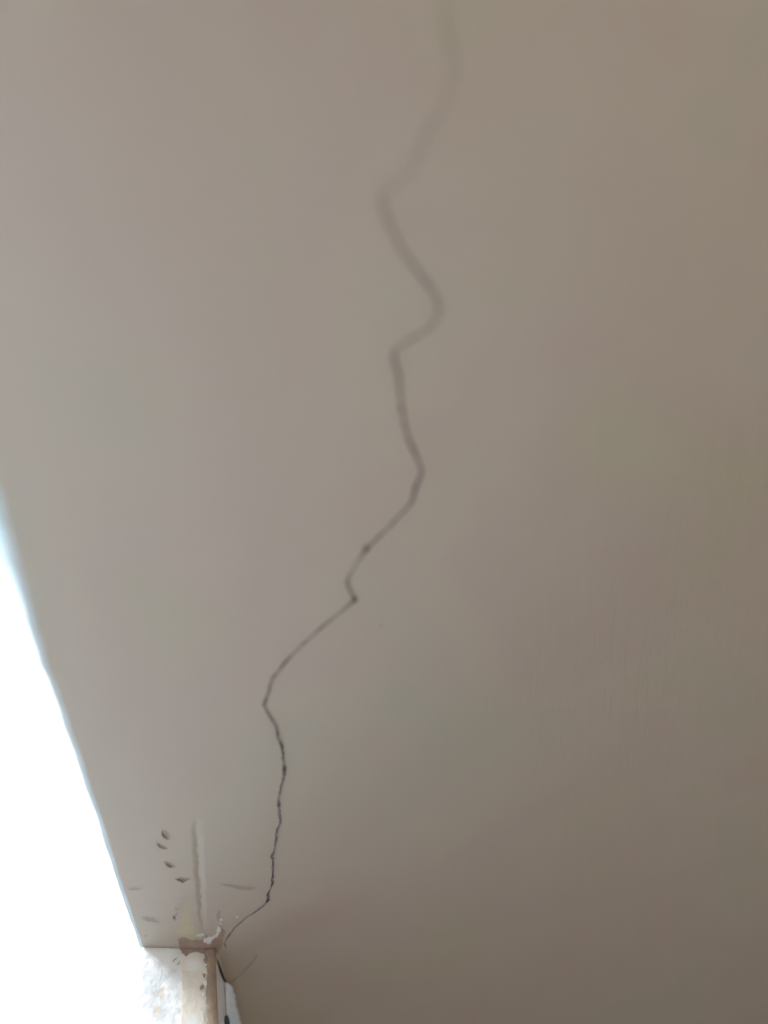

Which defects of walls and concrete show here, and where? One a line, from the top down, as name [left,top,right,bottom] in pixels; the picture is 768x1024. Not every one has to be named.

peeling [178,908,239,1024]
crack [216,0,456,983]